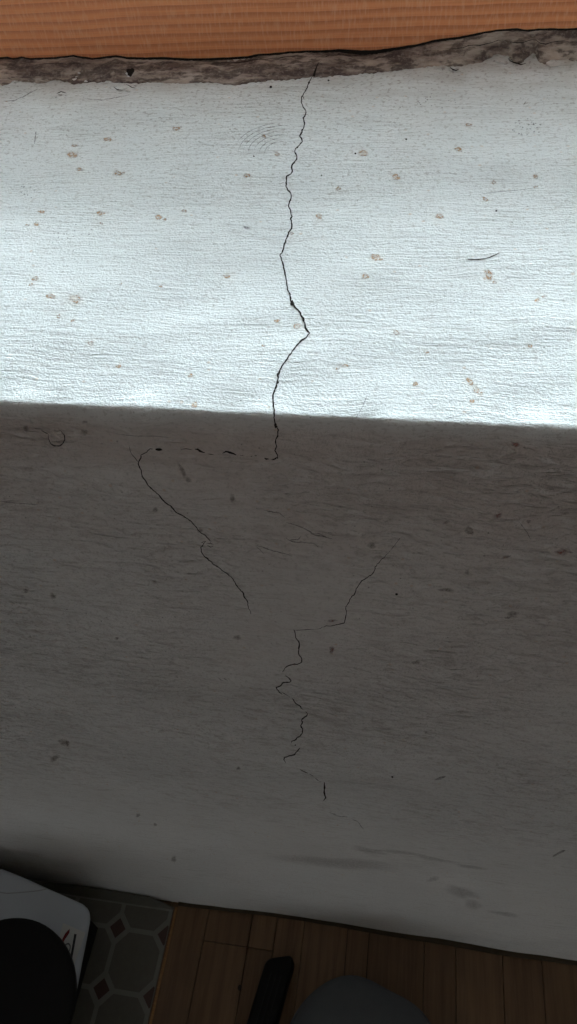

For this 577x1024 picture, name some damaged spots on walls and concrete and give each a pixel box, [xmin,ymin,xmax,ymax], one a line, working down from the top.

crack [129,61,331,613]
crack [276,541,398,827]